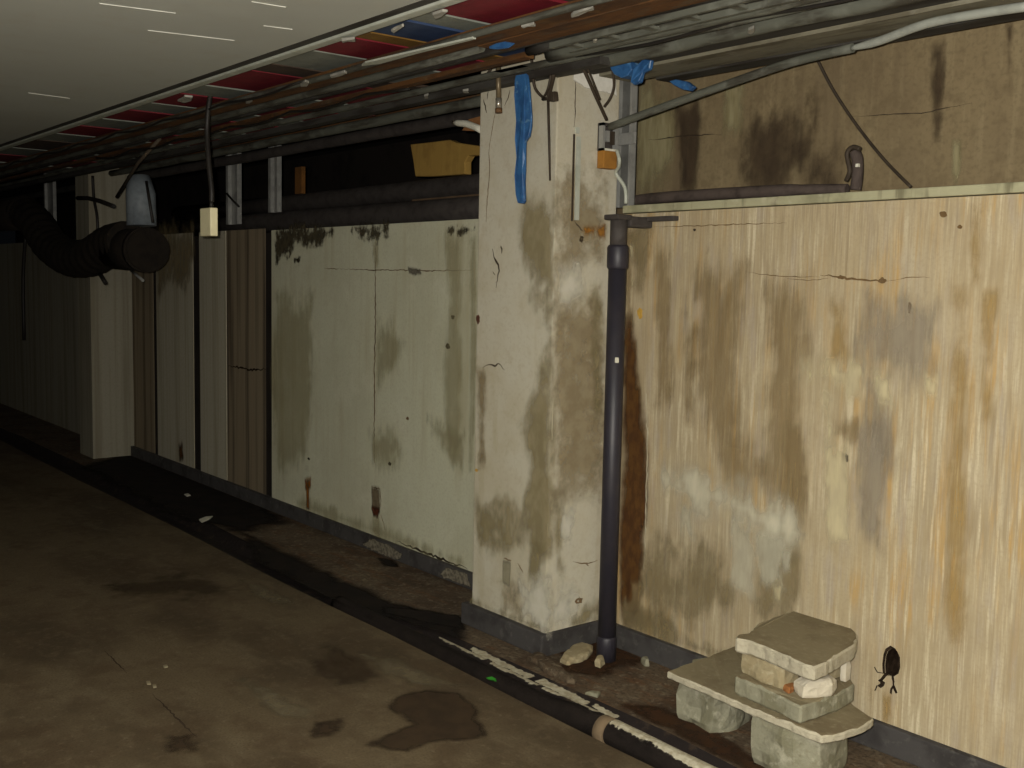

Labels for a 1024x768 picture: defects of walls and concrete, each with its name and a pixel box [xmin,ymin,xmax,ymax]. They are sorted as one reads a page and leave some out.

damp [933,52,944,126]
damp [745,120,832,186]
damp [275,223,333,265]
damp [351,219,389,245]
crack [492,247,503,286]
crack [745,271,928,282]
damp [477,179,603,632]
corrosion [620,316,647,617]
damp [624,255,802,644]
damp [825,326,892,541]
damp [369,690,486,751]